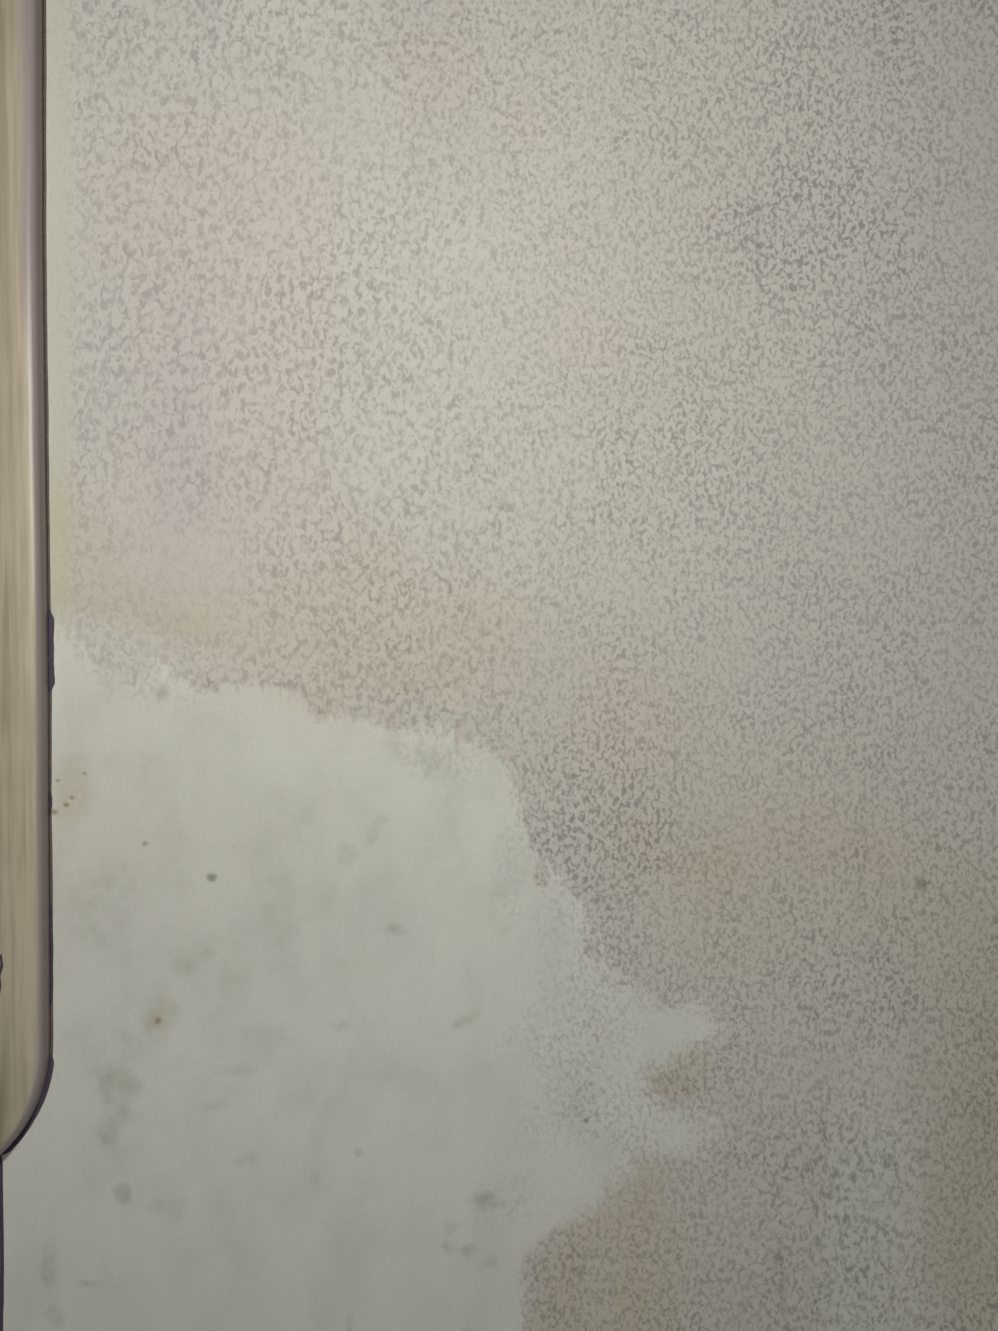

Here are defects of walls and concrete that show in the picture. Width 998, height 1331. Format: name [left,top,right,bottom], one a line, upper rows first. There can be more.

peeling [2,656,739,1331]